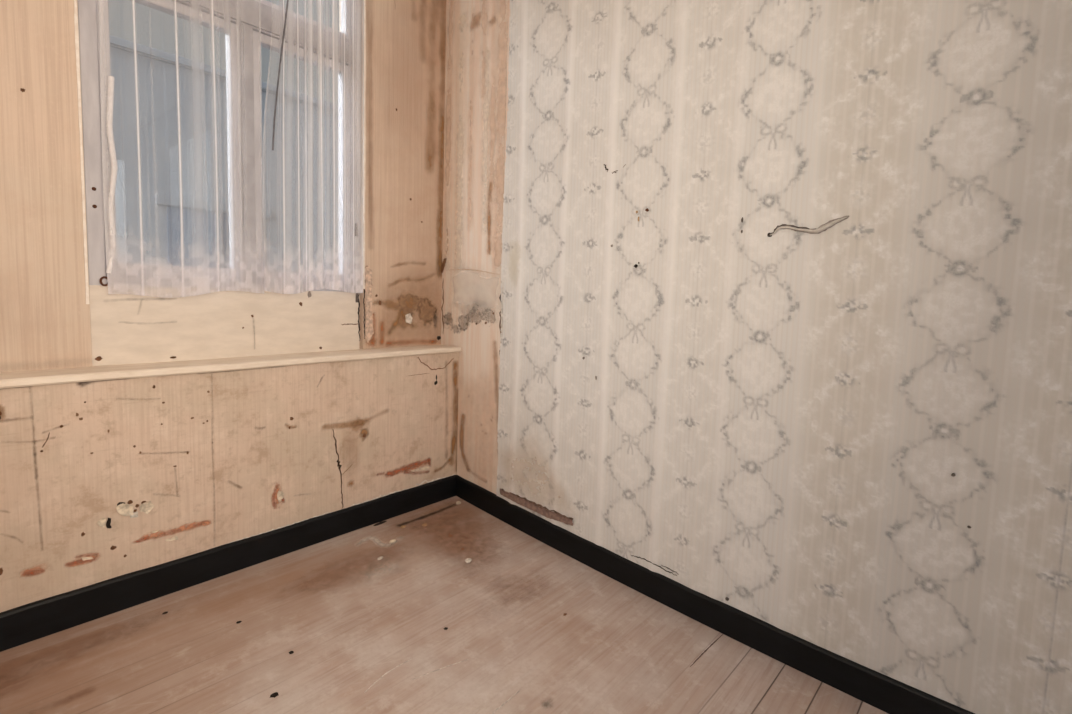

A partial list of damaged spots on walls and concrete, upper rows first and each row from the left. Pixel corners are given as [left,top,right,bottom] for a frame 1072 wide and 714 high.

water stain [428,30,507,275]
water stain [375,294,494,340]
crack [230,430,455,543]
spalling [377,459,431,476]
spalling [136,521,210,542]
spalling [68,555,95,566]